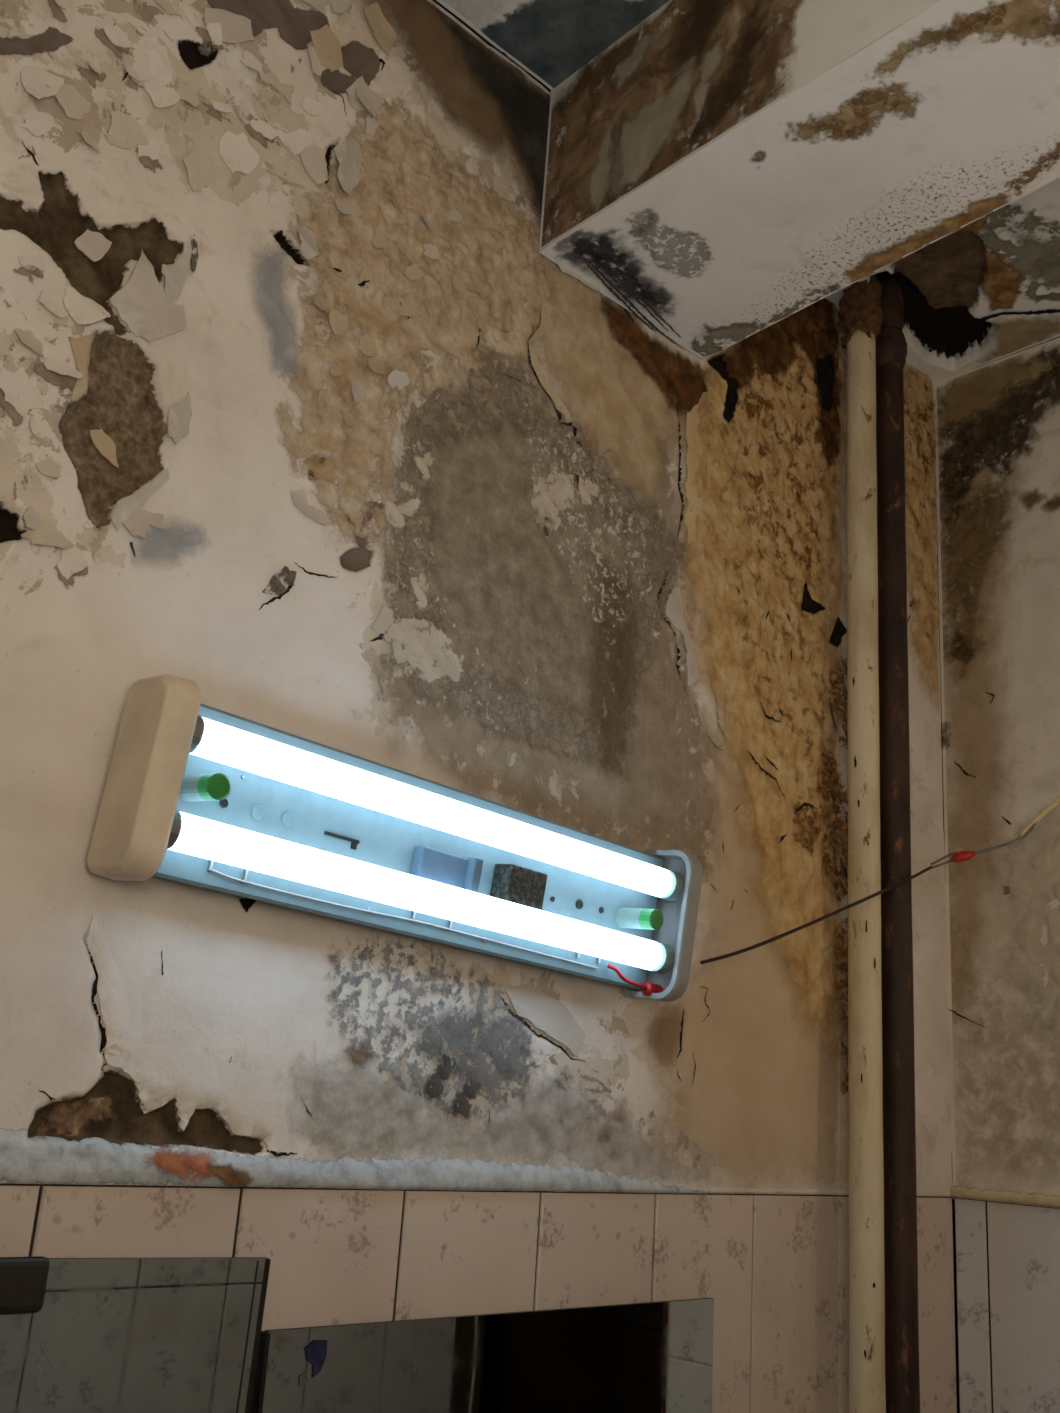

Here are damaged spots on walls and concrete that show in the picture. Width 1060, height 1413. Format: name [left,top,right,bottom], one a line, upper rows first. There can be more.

spalling [874,218,1060,359]
flaking render [0,0,714,859]
damp [366,0,1060,1182]
peeling [239,898,256,912]
peeling [27,915,298,1157]
damp [327,942,537,1119]